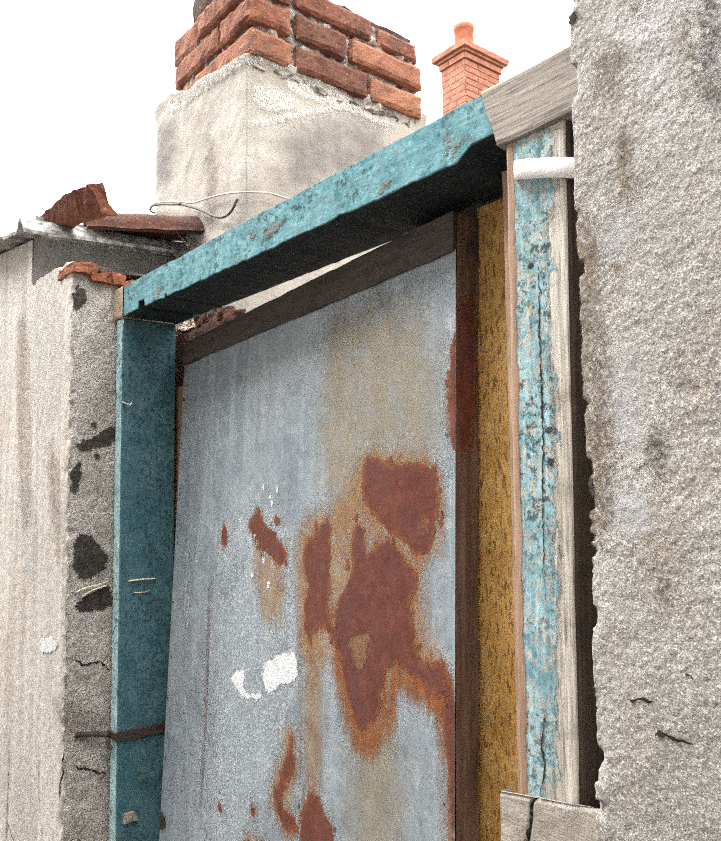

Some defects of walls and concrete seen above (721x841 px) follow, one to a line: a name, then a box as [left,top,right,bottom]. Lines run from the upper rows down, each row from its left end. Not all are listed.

spalling [57,261,134,310]
spalling [76,421,116,459]
crack [538,261,547,601]
spalling [70,462,82,494]
spalling [72,532,109,579]
corrosion [248,507,287,567]
spalling [75,586,113,612]
corrosion [298,455,454,841]
corrosion [273,735,336,841]
crack [526,715,545,841]